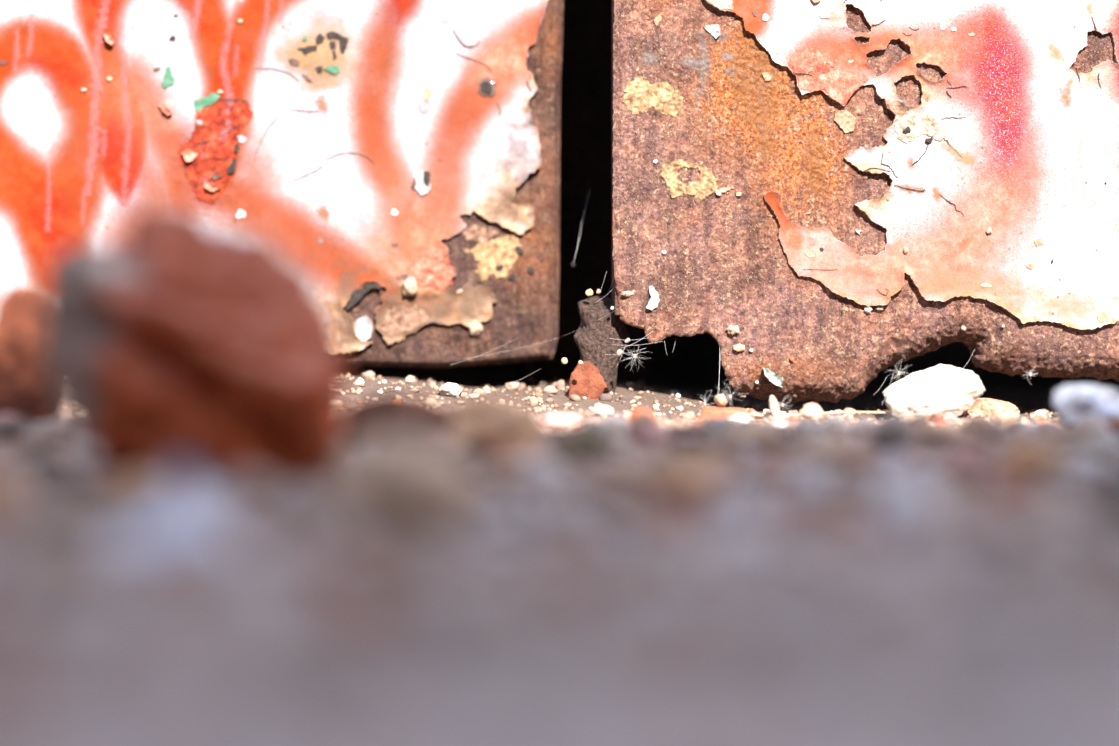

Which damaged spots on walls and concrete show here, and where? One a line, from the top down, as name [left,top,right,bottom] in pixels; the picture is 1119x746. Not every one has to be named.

peeling [339,0,564,368]
peeling [612,0,1119,403]
rust [900,185,940,198]
rust [947,146,974,163]